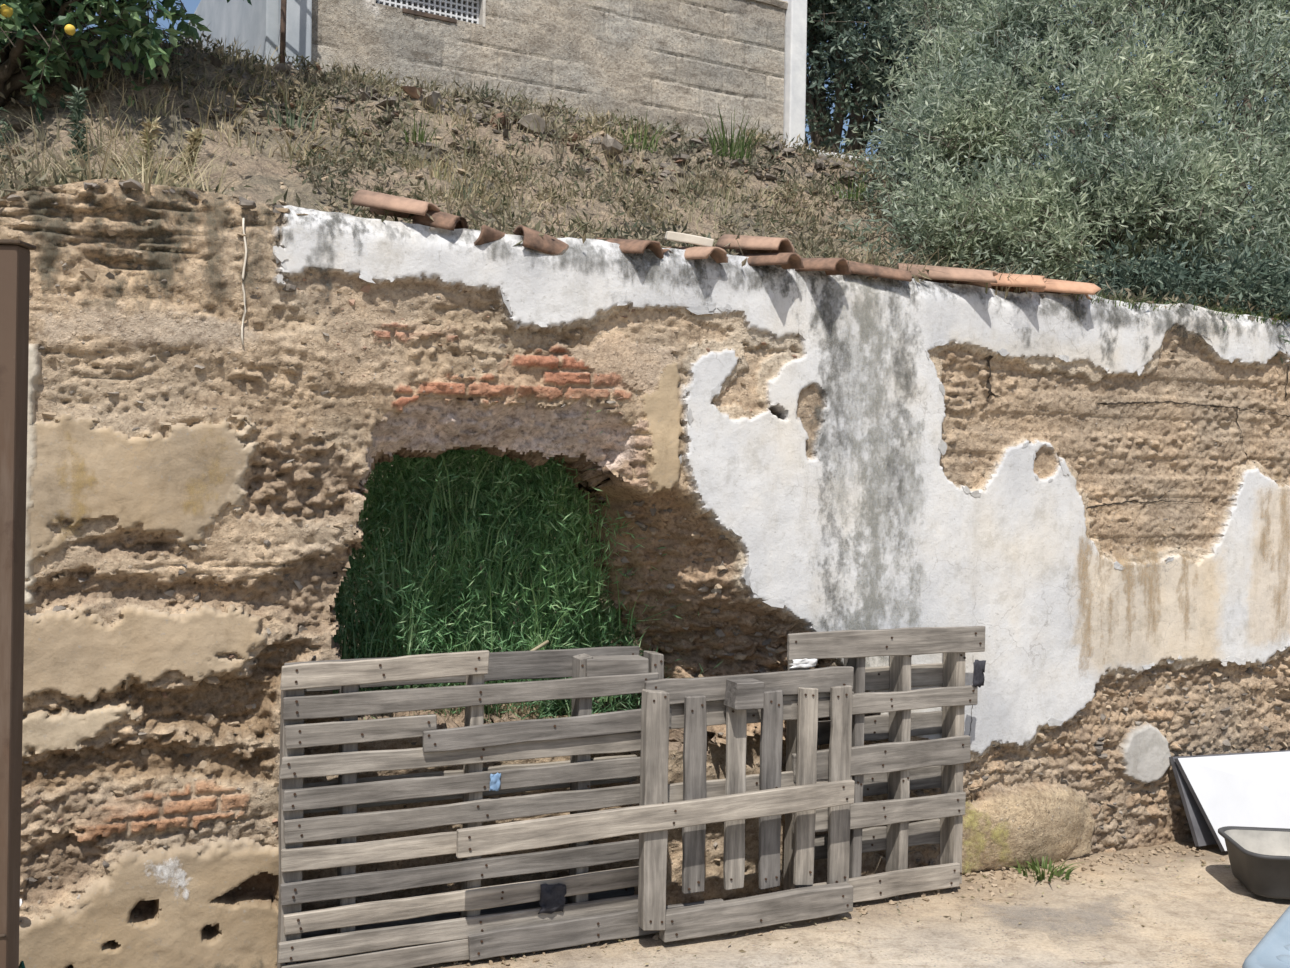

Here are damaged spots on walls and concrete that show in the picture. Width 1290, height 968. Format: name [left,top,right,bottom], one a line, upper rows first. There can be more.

leakage [560,240,789,293]
leakage [1035,297,1284,355]
spalling [796,382,831,460]
leakage [811,274,946,630]
spalling [925,323,1290,570]
crack [1097,366,1290,464]
spalling [0,177,823,927]
leakage [1079,529,1093,655]
spalling [963,644,1290,854]
spalling [813,858,828,884]
spalling [861,850,886,876]
spalling [908,844,940,869]